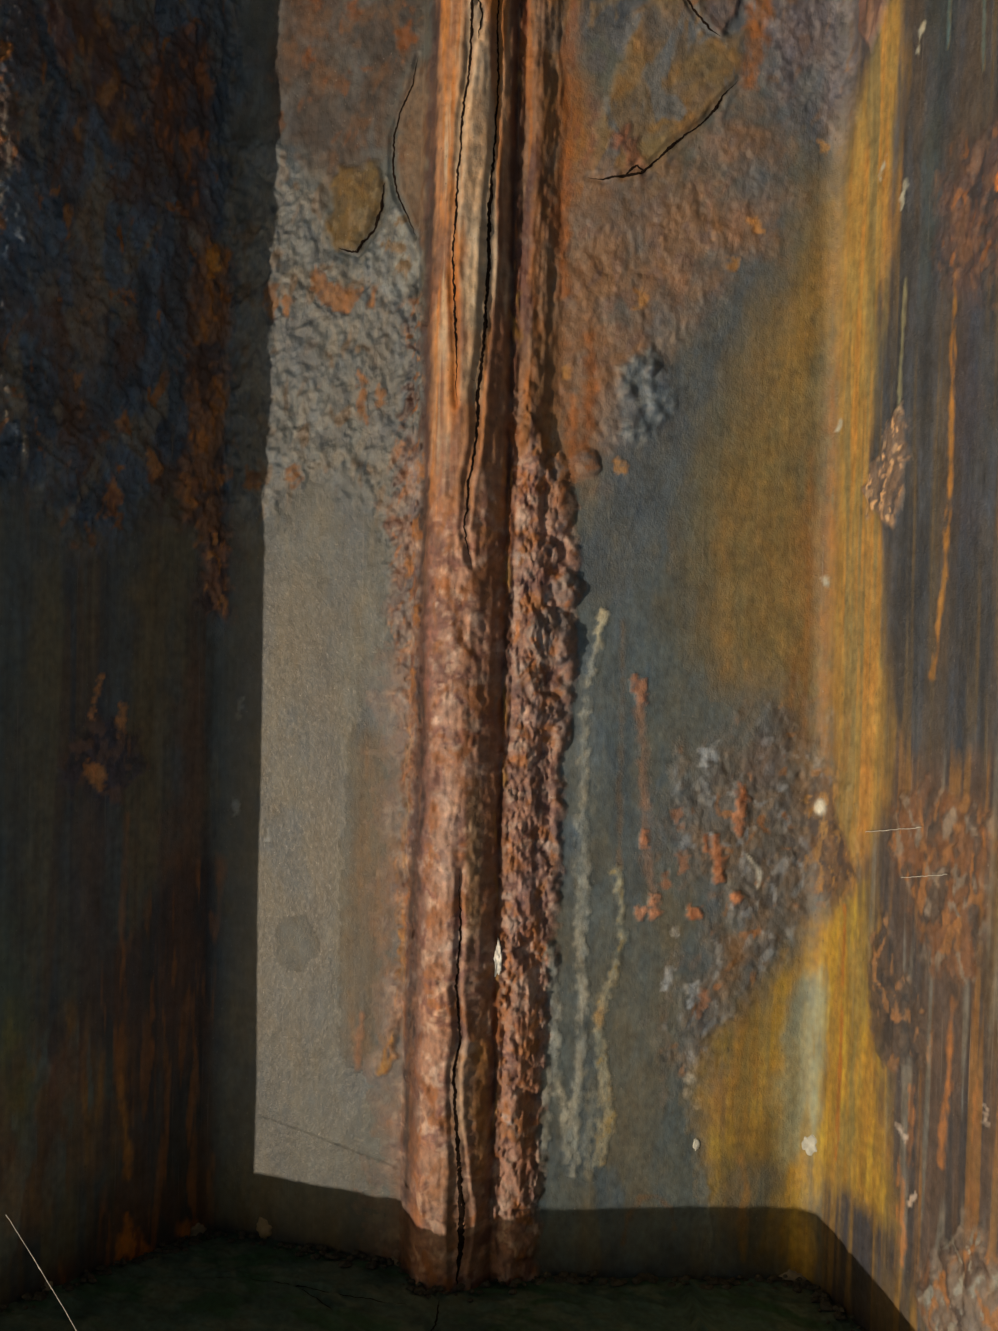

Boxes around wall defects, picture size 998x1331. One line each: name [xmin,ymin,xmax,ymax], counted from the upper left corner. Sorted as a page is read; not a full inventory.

crack [339,56,419,253]
crack [590,83,736,180]
crack [687,0,720,36]
crack [451,0,500,565]
corrosion [611,454,632,476]
corrosion [261,0,605,1279]
corrosion [665,0,998,1331]
corrosion [628,672,693,922]
corrosion [0,852,229,1302]